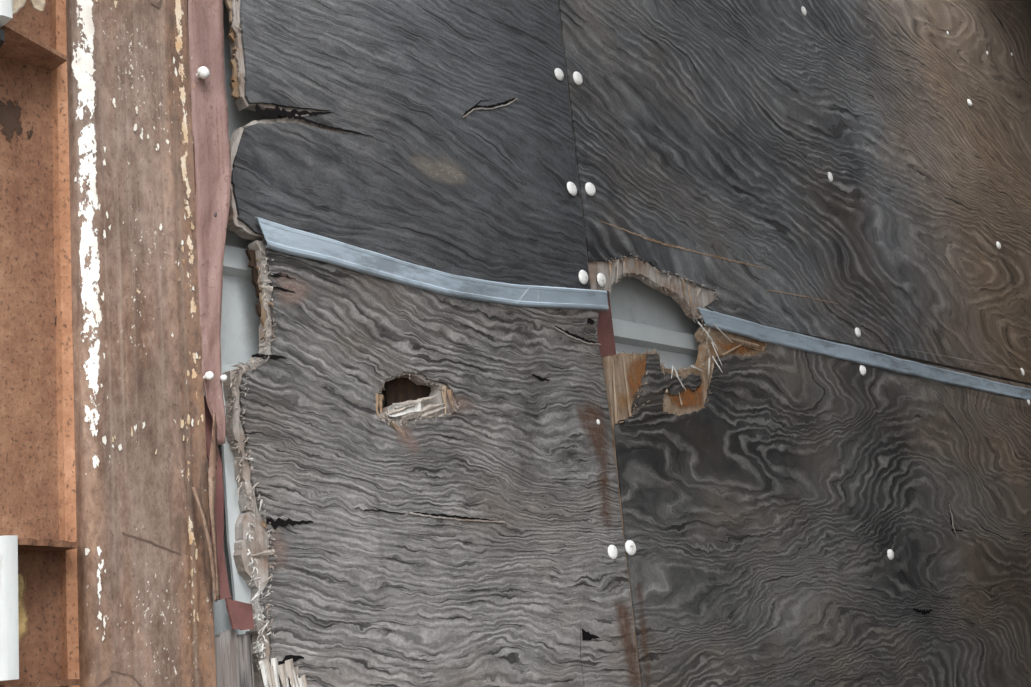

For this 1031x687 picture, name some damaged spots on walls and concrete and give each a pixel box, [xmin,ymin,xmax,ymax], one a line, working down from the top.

peeling [173,0,197,318]
crack [255,104,373,137]
crack [462,98,517,118]
peeling [72,0,124,468]
peeling [180,414,203,443]
peeling [187,351,201,398]
spalling [376,371,460,437]
rust [582,408,608,516]
spalling [605,253,769,426]
peeling [188,516,199,622]
spalling [257,658,308,687]
rust [618,604,638,682]